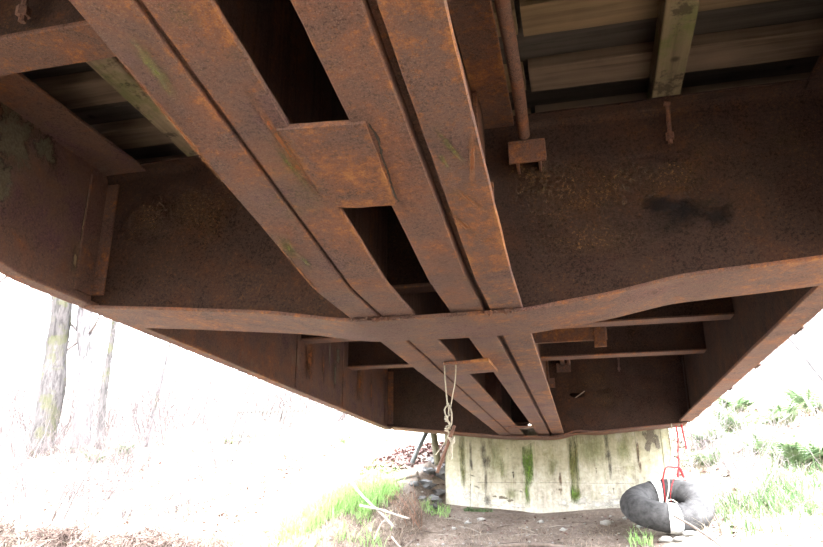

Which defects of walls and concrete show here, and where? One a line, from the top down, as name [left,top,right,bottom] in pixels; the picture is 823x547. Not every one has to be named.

rust [139,83,217,174]
water stain [459,441,472,483]
water stain [523,449,533,502]
water stain [569,449,579,502]